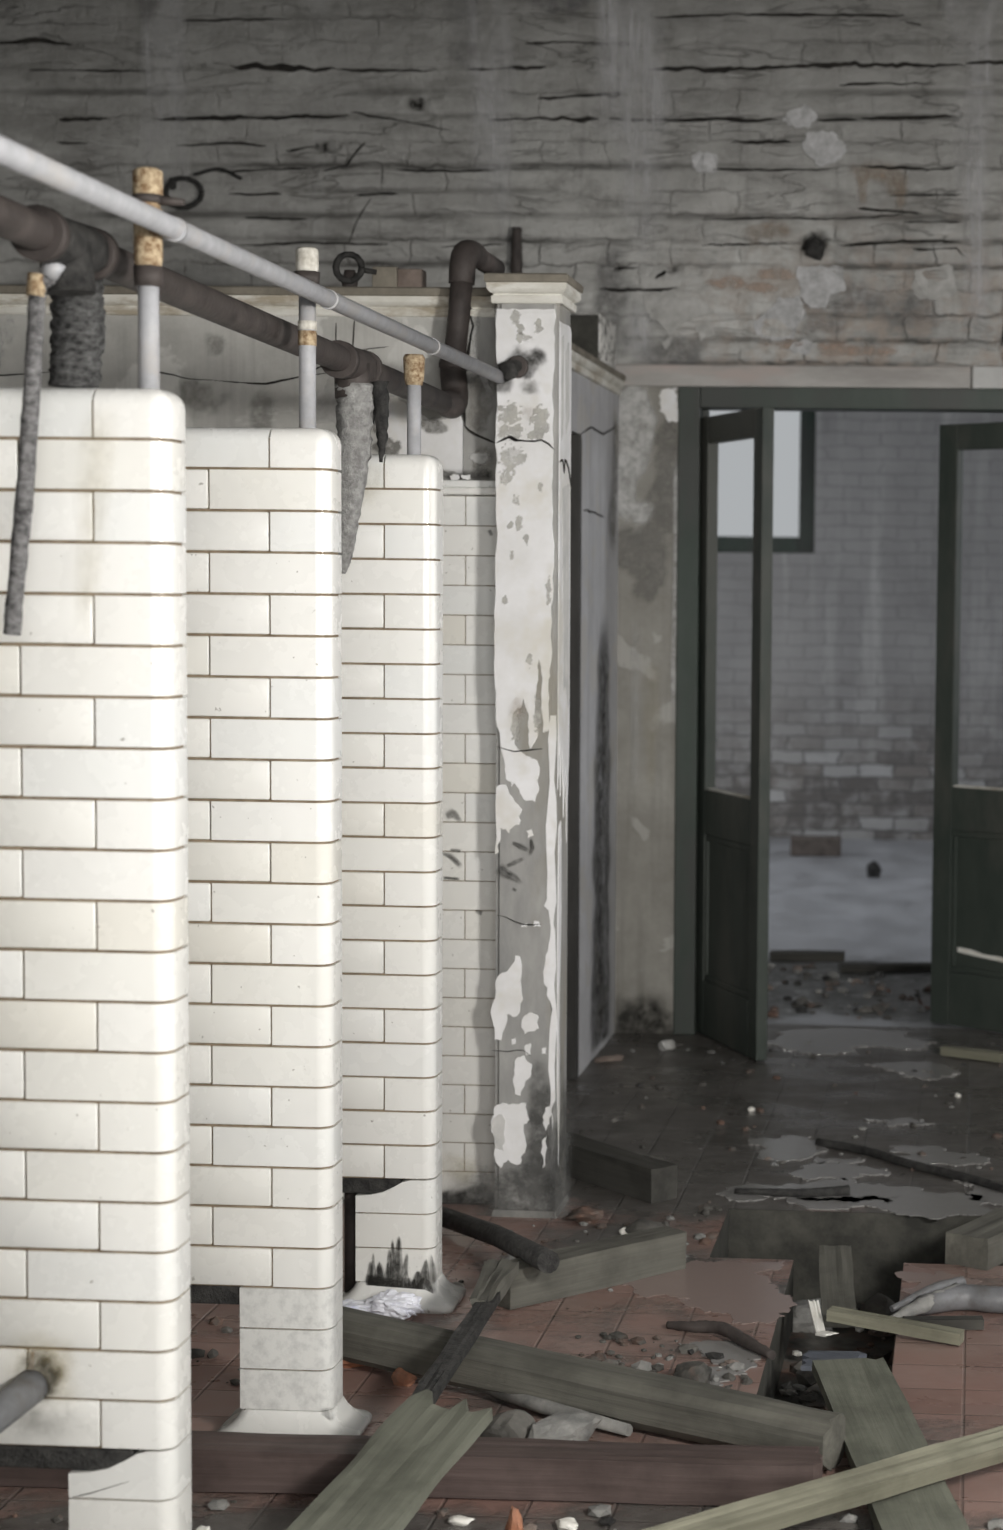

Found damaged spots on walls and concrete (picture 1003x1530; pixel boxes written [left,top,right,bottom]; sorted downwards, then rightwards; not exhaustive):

crack [183,16,290,24]
crack [0,37,142,73]
crack [56,116,109,144]
crack [230,13,1003,256]
flaking render [782,103,847,167]
crack [152,112,496,246]
crack [600,267,678,292]
flaking render [912,264,957,301]
leakage [610,421,678,601]
peeling [490,309,572,1168]